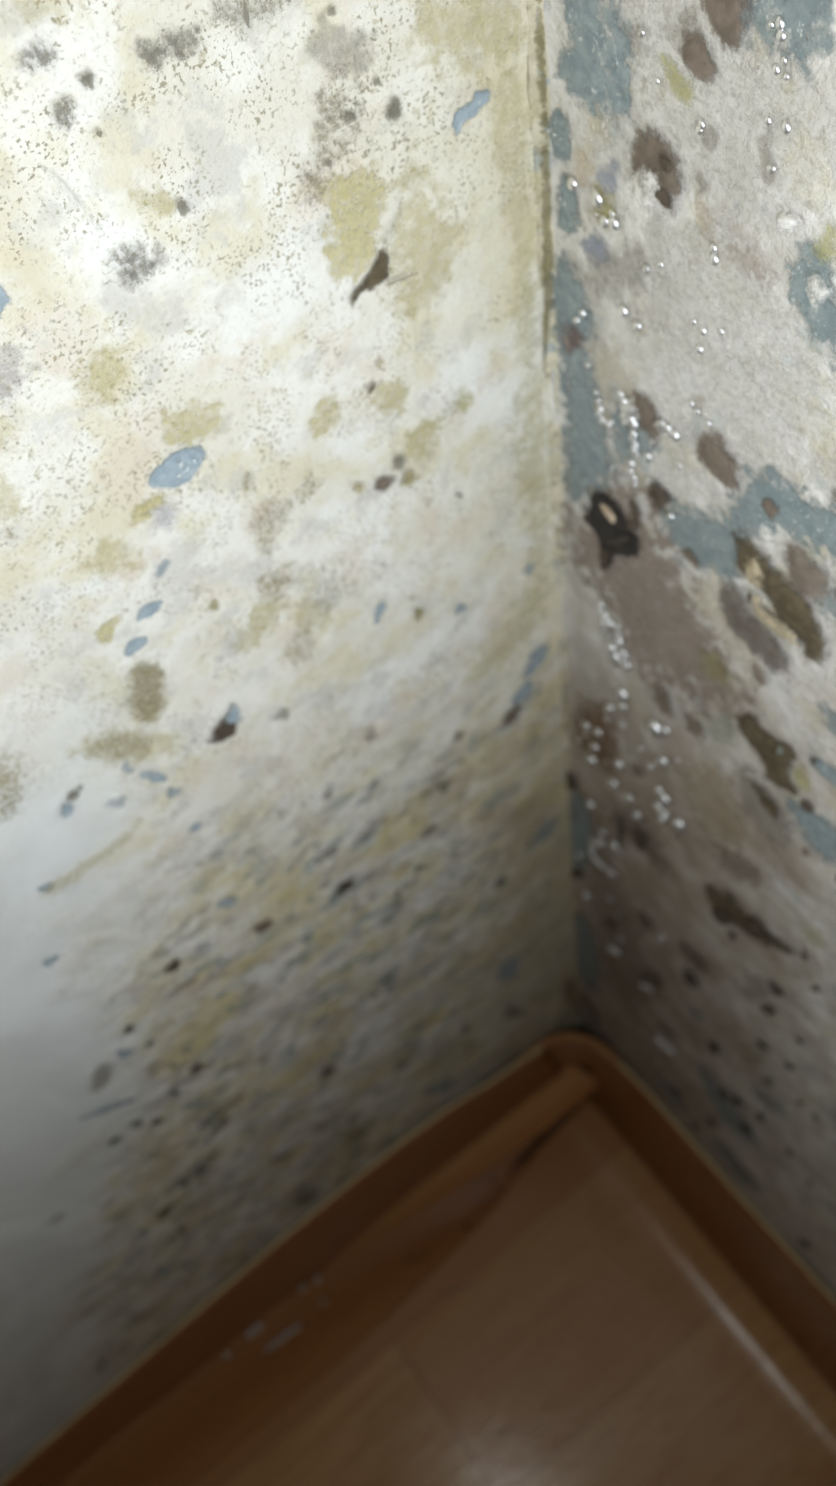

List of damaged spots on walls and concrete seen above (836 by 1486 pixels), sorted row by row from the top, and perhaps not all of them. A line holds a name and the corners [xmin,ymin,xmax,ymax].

damp [138,0,291,71]
damp [20,44,57,71]
damp [80,73,94,90]
damp [54,99,75,128]
damp [385,98,401,121]
damp [300,78,386,284]
damp [177,200,190,216]
damp [113,247,154,285]
damp [353,420,441,493]
damp [210,705,243,744]
damp [62,786,83,818]
damp [734,758,816,856]